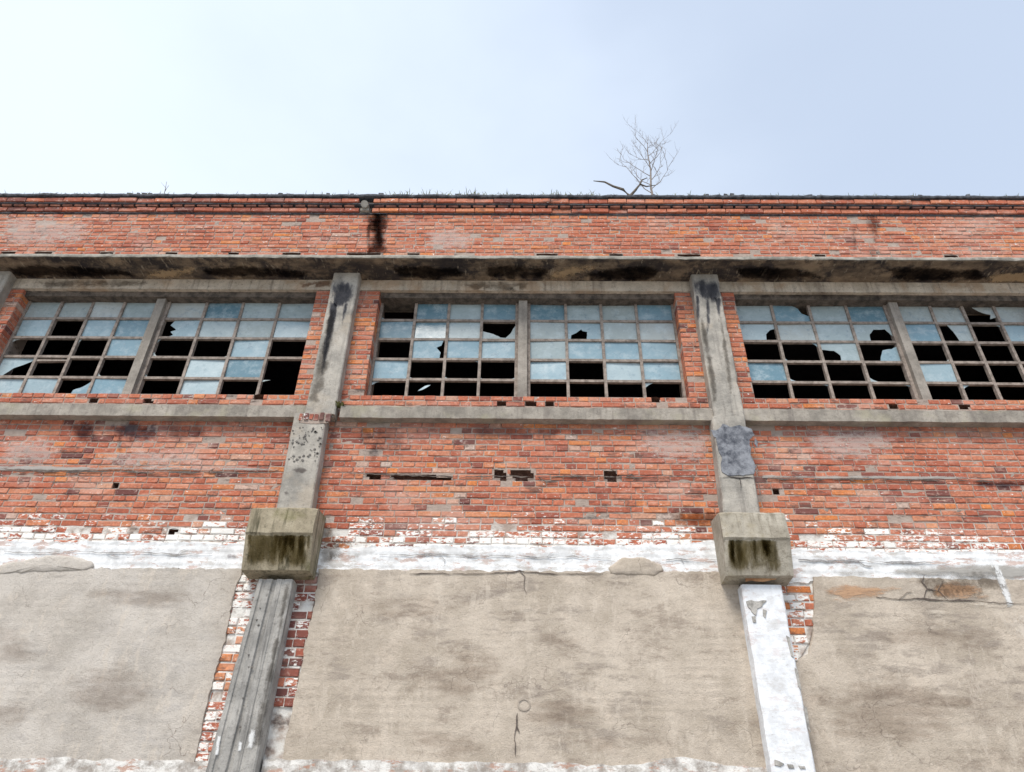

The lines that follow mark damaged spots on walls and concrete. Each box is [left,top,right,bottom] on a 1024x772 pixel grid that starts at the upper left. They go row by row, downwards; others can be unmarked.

leakage [367,207,386,253]
leakage [323,303,346,365]
flaking render [195,575,261,762]
flaking render [274,576,319,708]
crack [380,552,611,591]
peeling [746,600,767,623]
flaking render [781,586,814,690]
crack [798,559,1021,604]